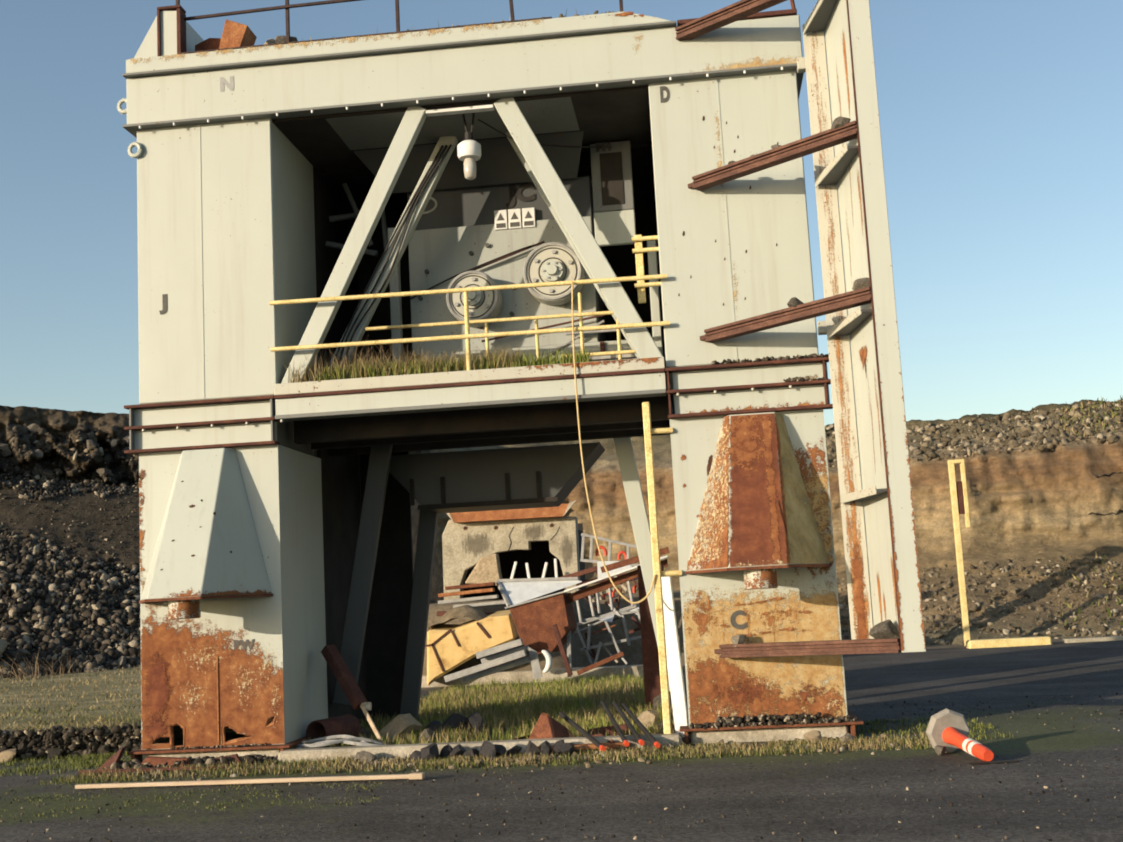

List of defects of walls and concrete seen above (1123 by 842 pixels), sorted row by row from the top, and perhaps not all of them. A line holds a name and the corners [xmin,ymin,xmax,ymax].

rust [819,150,866,294]
rust [140,588,285,750]
rust [682,401,846,724]
rust [833,311,904,651]
rust [904,415,926,650]